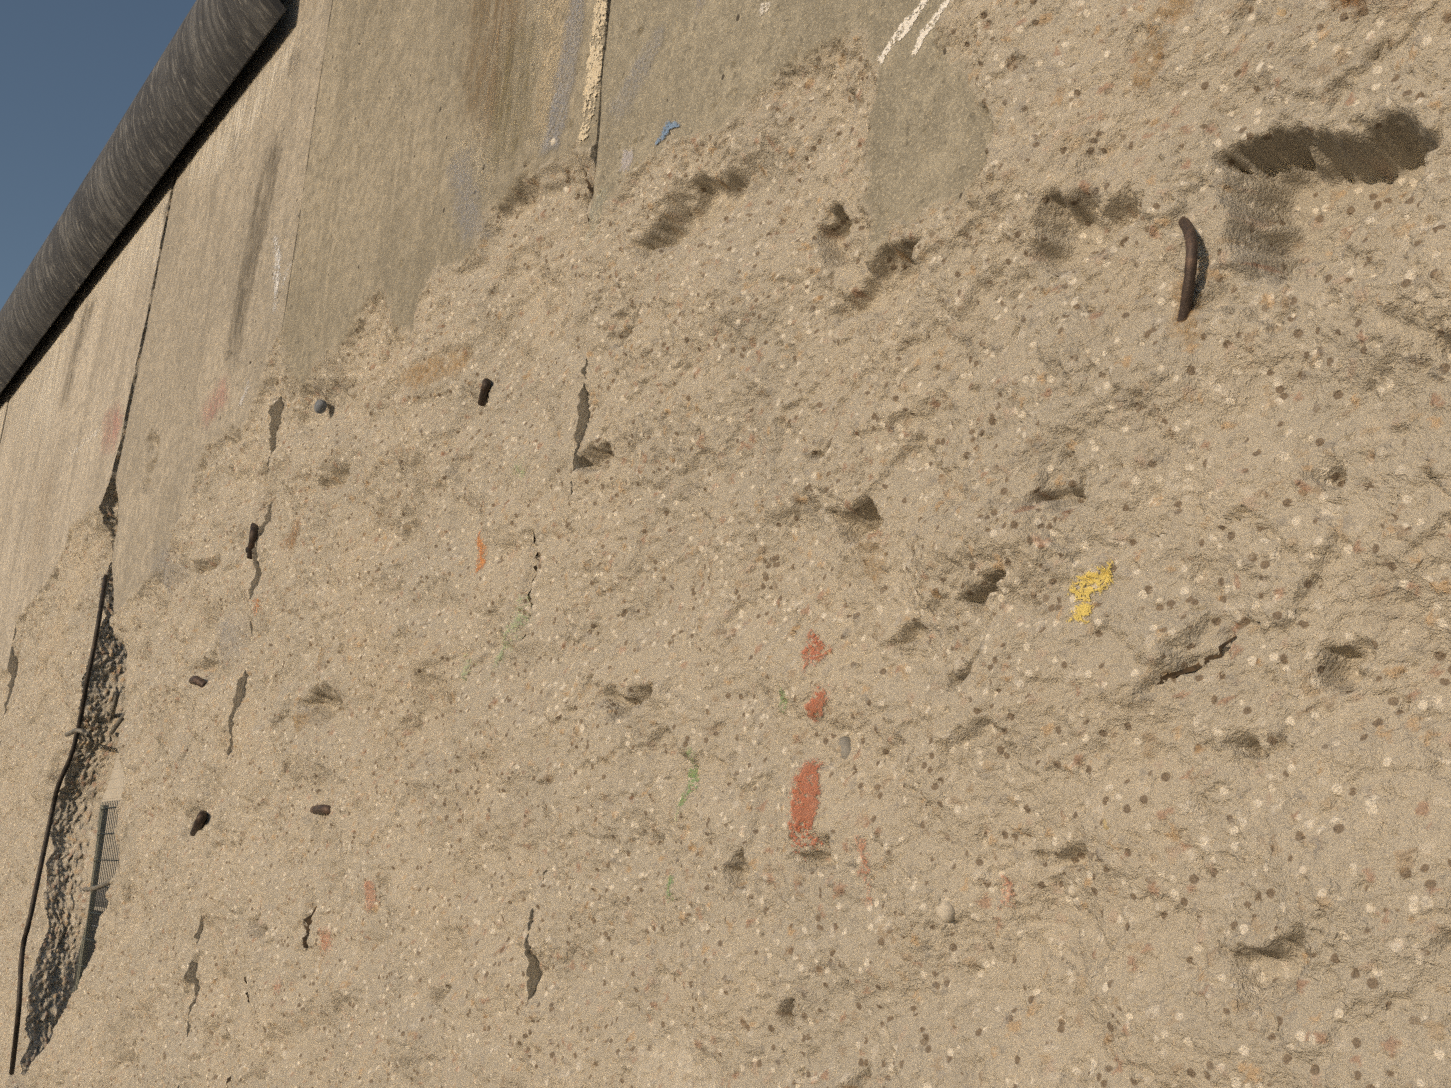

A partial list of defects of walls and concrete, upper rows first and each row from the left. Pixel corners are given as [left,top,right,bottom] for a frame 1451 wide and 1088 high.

spalling [0,146,596,1088]
spalling [515,0,1451,1088]